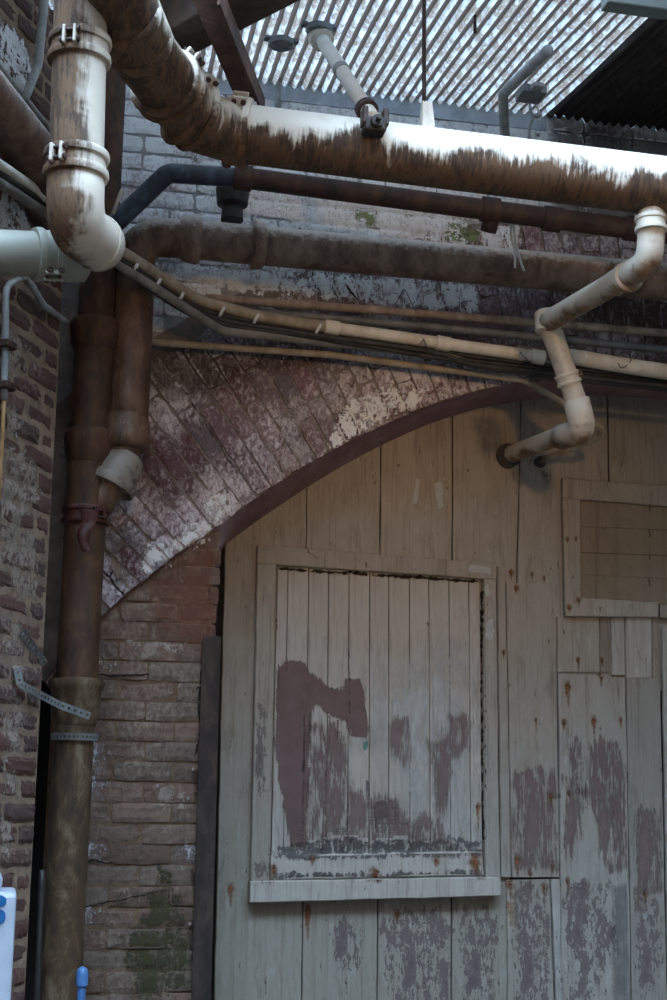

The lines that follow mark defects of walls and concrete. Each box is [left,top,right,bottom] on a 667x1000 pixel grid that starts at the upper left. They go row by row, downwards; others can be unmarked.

peeling [141,383,446,573]
peeling [254,659,485,884]
peeling [379,728,664,1000]